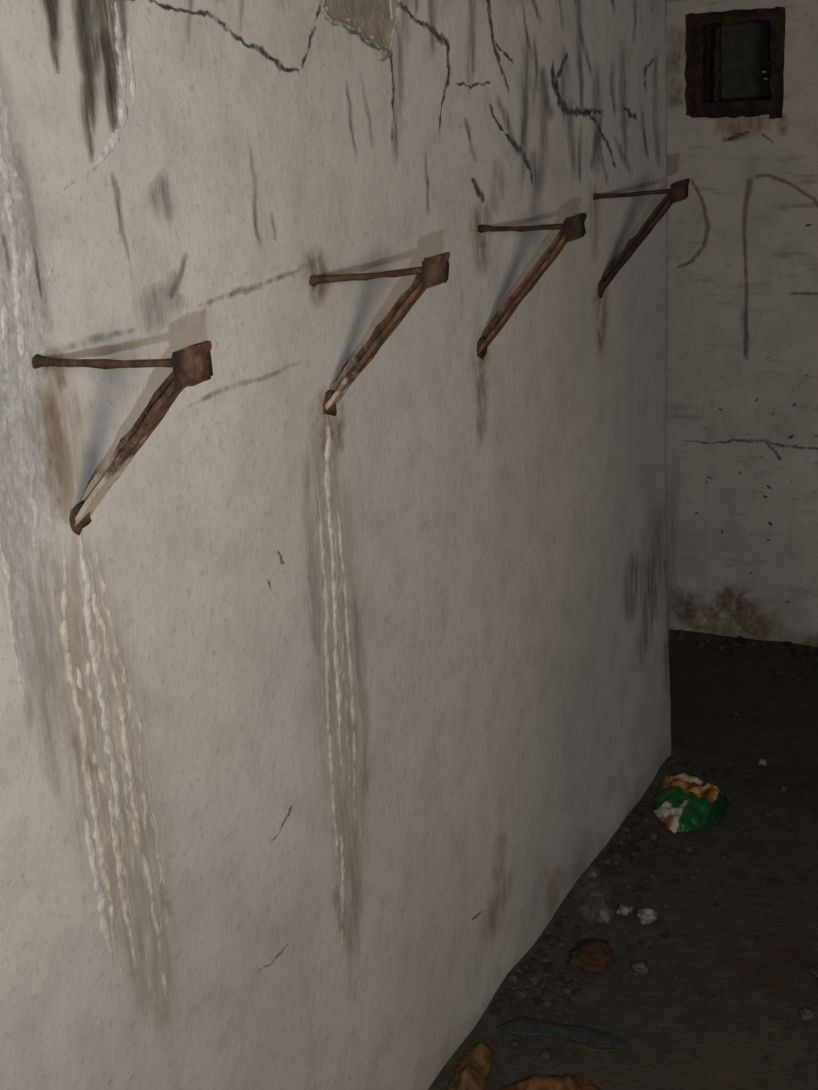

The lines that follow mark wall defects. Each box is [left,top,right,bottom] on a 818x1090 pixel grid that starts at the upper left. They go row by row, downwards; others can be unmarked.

leakage [44,0,58,66]
leakage [63,0,136,189]
crack [132,0,320,72]
spalling [321,0,398,62]
crack [388,53,396,139]
crack [399,0,533,181]
crack [551,39,637,167]
crack [471,178,484,202]
leakage [0,85,54,710]
crack [693,439,818,460]
leakage [316,414,358,970]
leakage [50,529,168,1019]